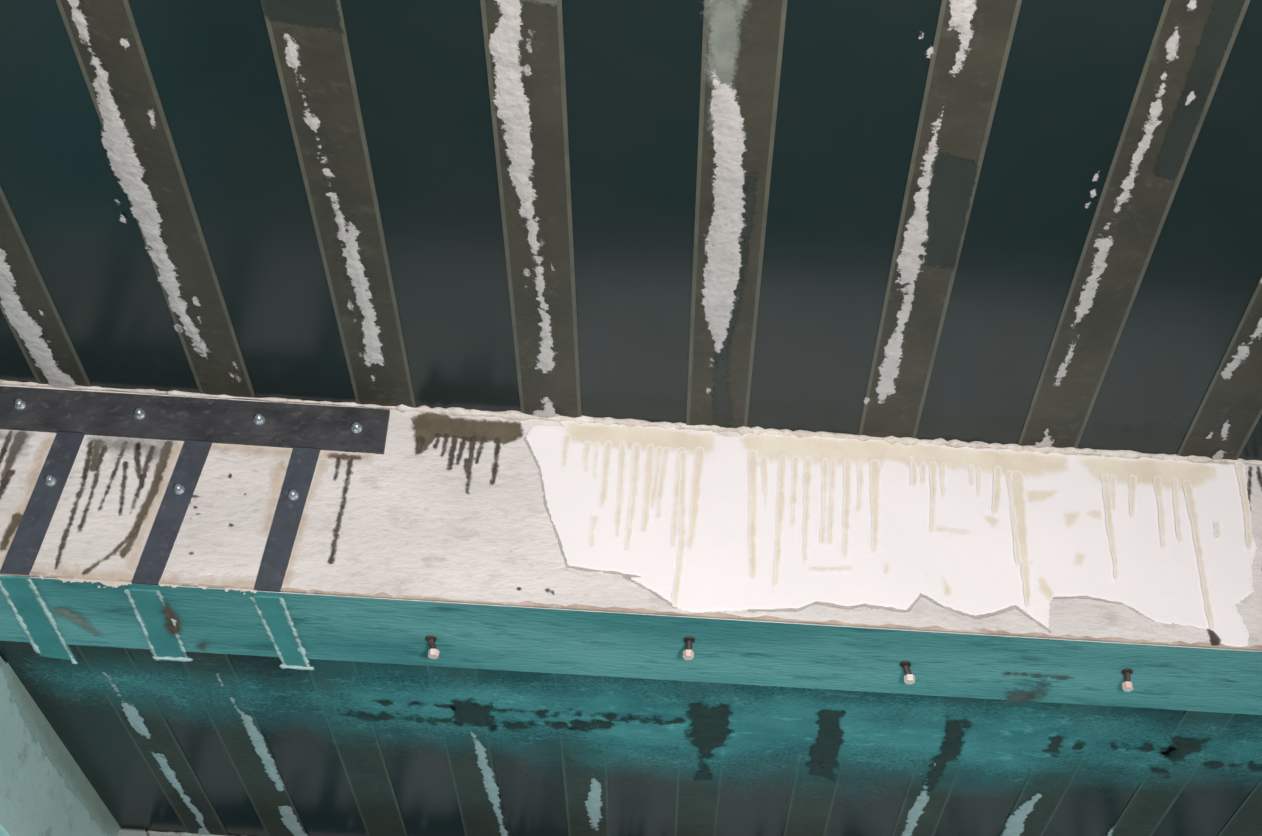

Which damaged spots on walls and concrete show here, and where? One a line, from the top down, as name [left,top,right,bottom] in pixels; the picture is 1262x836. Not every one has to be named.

damp [705,0,747,130]
flaking render [489,0,556,373]
flaking render [1054,27,1180,386]
damp [0,514,22,550]
damp [0,431,27,499]
spalling [0,571,132,582]
damp [55,440,172,574]
damp [328,454,361,564]
peeling [270,397,1262,651]
damp [560,176,1262,631]
flaking render [1221,318,1262,379]